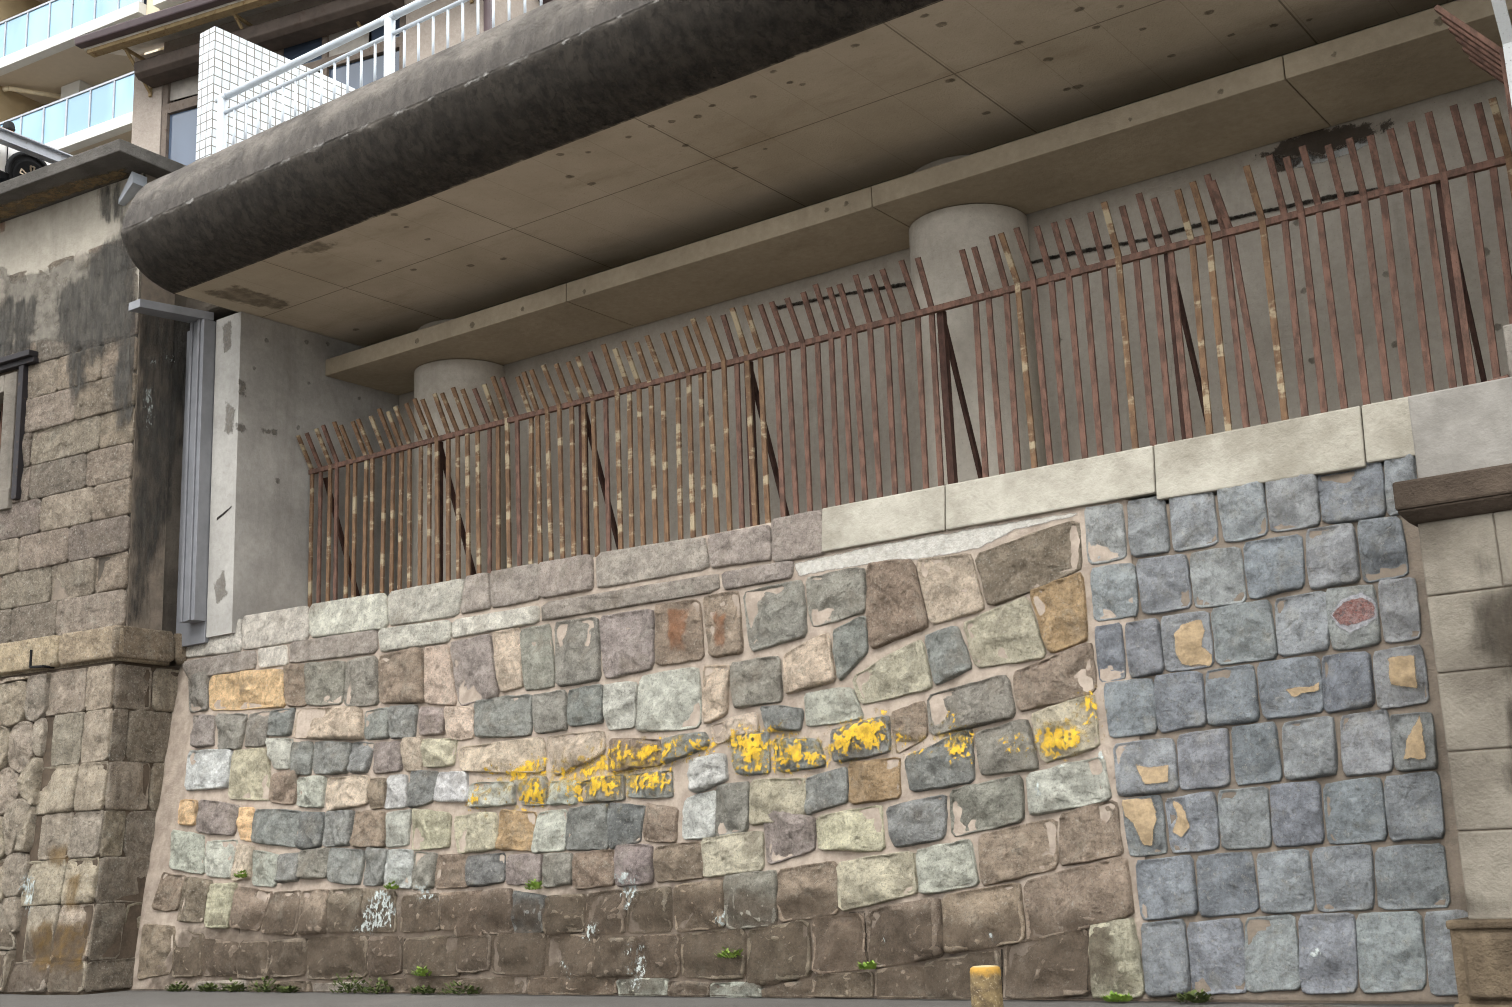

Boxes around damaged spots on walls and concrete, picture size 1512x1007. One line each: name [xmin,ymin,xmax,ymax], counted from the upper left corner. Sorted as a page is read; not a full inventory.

leakage [0,296,36,358]
flaking render [0,252,120,347]
leakage [57,183,190,621]
leakage [1478,593,1512,669]